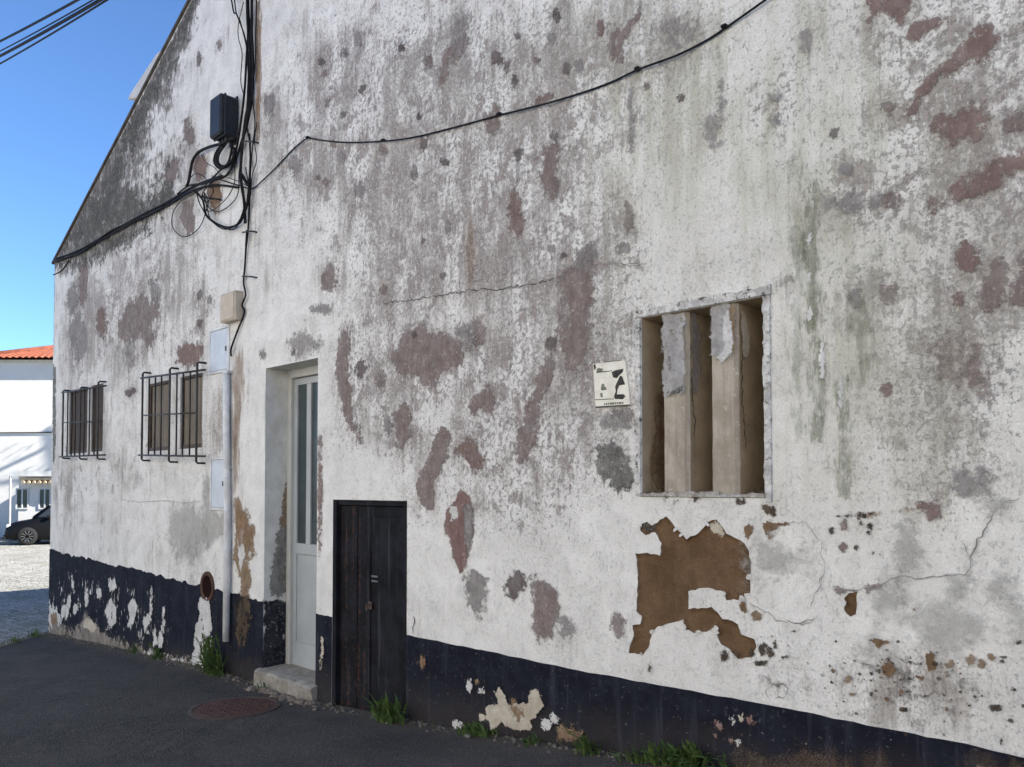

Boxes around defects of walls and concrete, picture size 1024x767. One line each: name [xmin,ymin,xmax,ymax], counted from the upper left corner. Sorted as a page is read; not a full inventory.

leakage [59,0,200,278]
peeling [667,312,702,394]
peeling [716,305,750,364]
leakage [594,438,635,495]
peeling [233,498,257,599]
flaking render [609,489,789,659]
crack [749,498,1018,626]
peeling [48,573,191,664]
peeling [466,678,583,742]
spalling [881,662,896,677]
spalling [925,651,996,676]